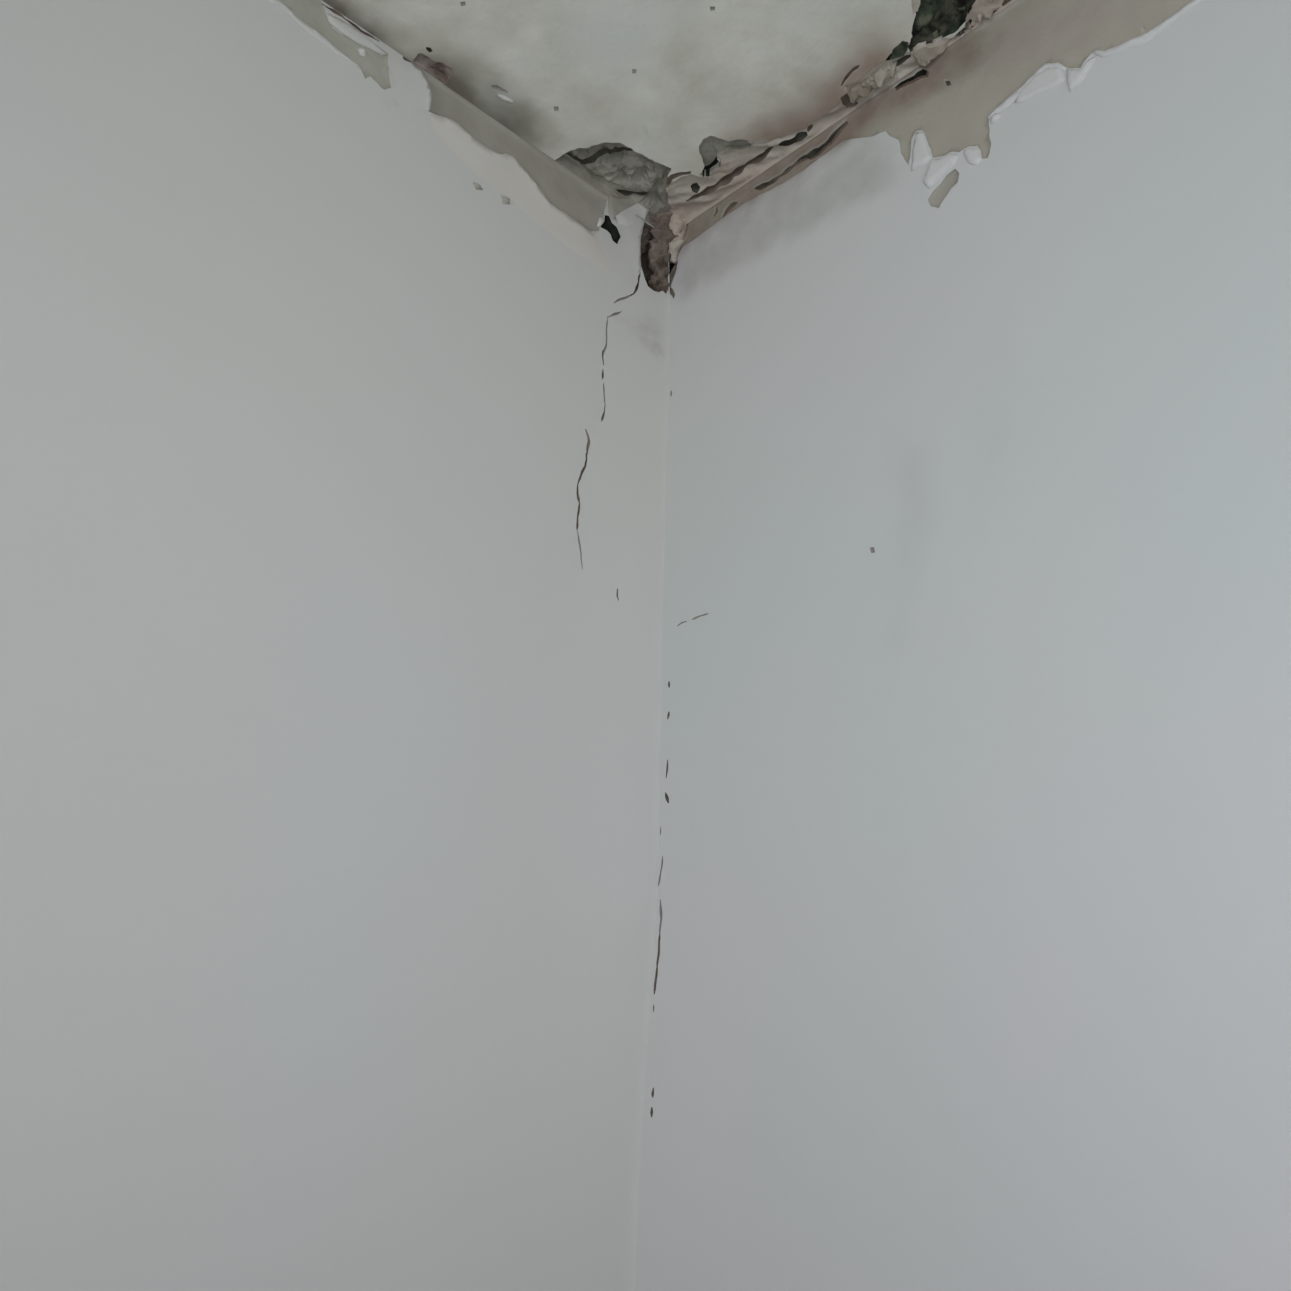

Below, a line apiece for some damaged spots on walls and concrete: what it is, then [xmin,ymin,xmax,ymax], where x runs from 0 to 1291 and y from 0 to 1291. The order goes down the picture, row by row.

peeling [268,0,1201,299]
crack [576,294,632,569]
crack [653,760,669,1012]